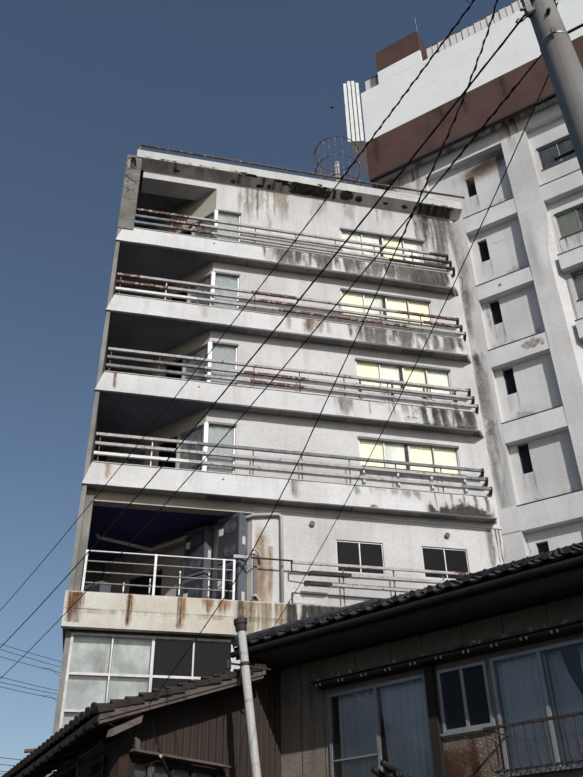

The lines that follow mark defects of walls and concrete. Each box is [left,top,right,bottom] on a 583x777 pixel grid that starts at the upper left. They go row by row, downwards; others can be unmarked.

leakage [275,203,453,286]
leakage [350,326,463,352]
leakage [421,407,478,429]
leakage [429,495,492,517]
corrosion [203,542,284,634]
corrosion [68,591,83,621]